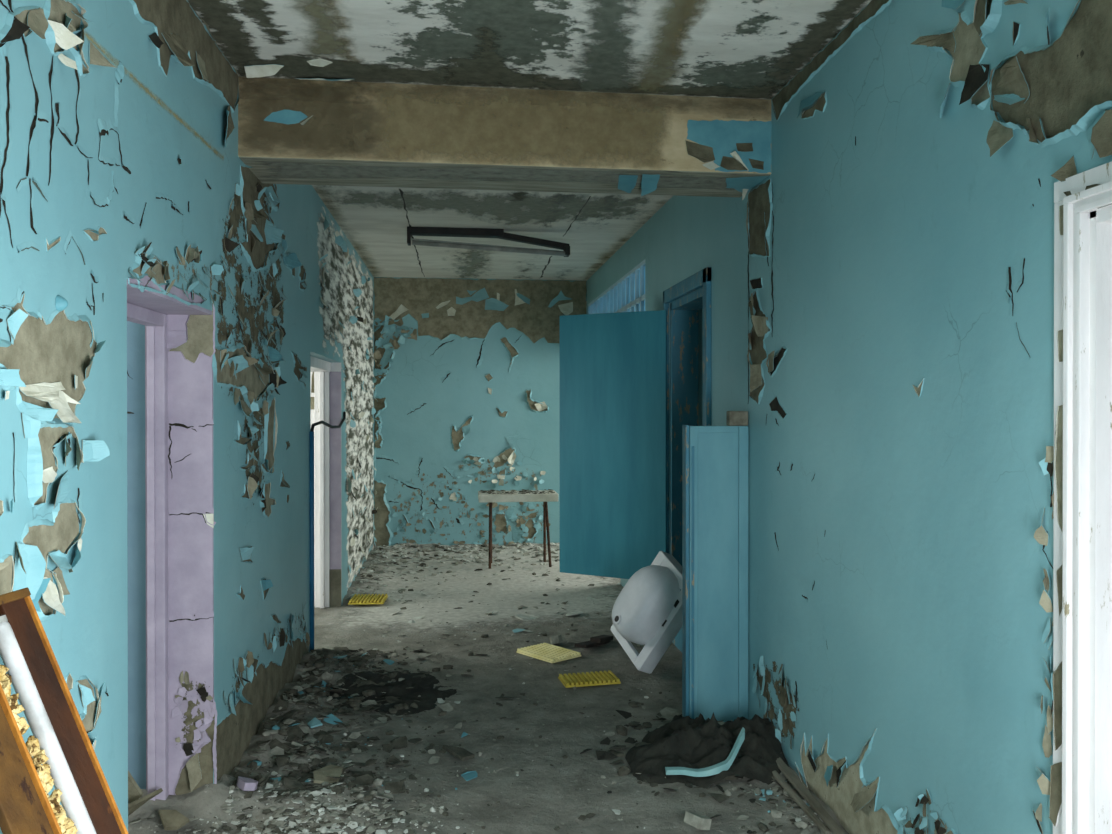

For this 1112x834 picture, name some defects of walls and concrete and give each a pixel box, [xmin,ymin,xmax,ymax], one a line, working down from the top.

crack [0,0,211,348]
leakage [124,69,223,158]
leakage [187,0,869,227]
peeling [911,0,1112,159]
peeling [0,293,110,622]
crack [168,418,214,479]
crack [169,507,216,526]
peeling [128,164,587,591]
peeling [1034,404,1063,546]
crack [169,612,214,622]
spalling [172,603,310,795]
peeling [1033,565,1062,834]